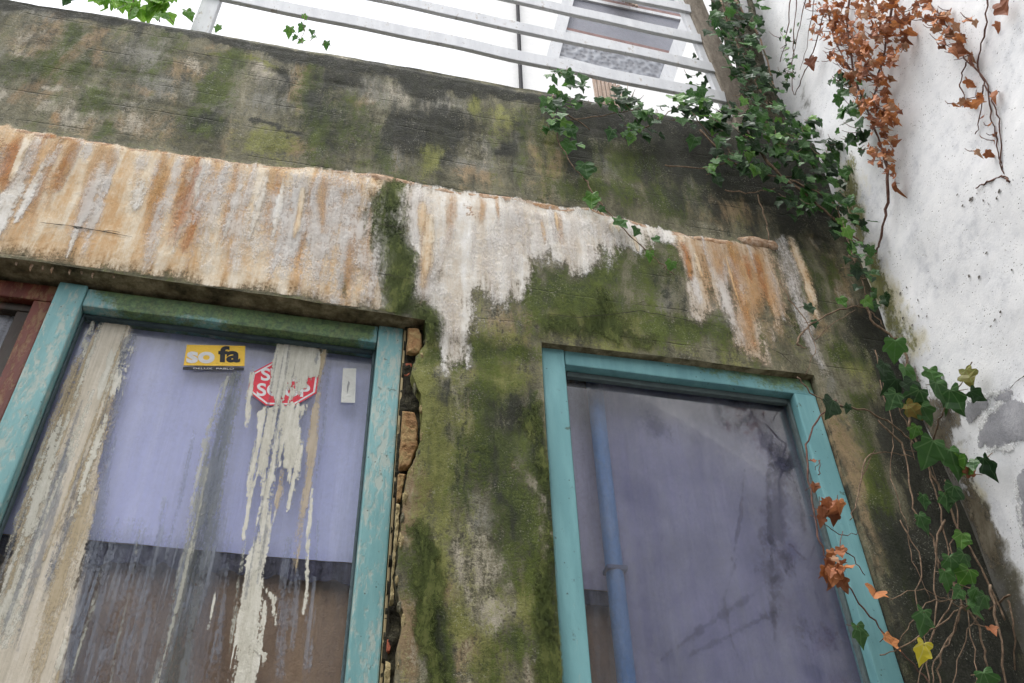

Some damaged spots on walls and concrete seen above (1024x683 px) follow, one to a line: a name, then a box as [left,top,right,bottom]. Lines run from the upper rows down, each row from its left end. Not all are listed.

rust [2,144,19,187]
leakage [0,125,822,373]
leakage [925,396,961,449]
spalling [380,327,428,683]
leakage [946,466,1005,571]
leakage [413,595,435,656]